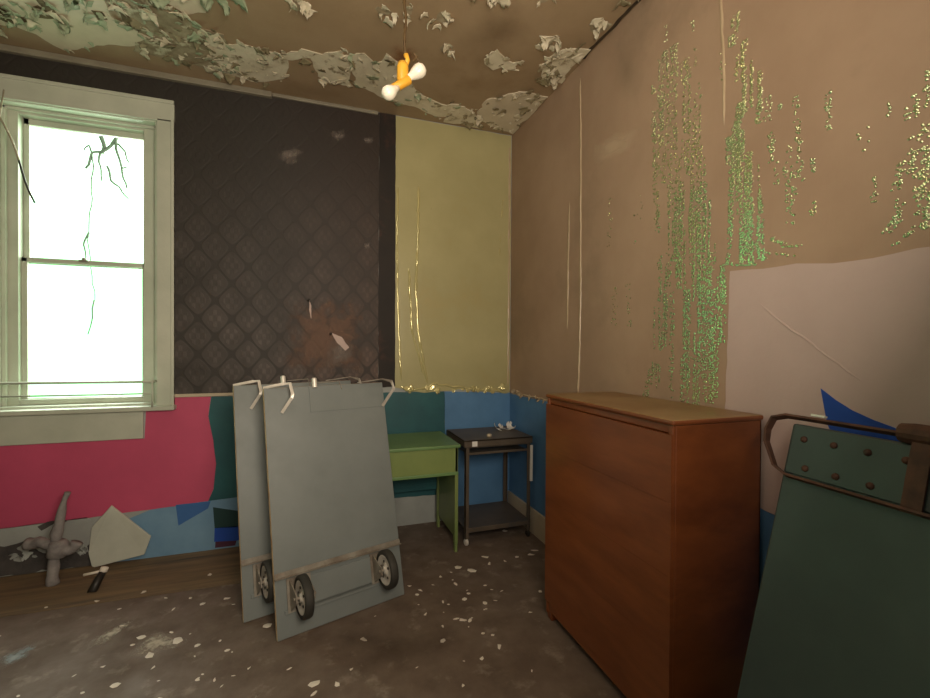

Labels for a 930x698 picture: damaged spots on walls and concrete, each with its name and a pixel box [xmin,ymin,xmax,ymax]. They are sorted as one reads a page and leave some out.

peeling [0,0,612,134]
peeling [400,382,547,404]
flaking render [725,247,930,515]